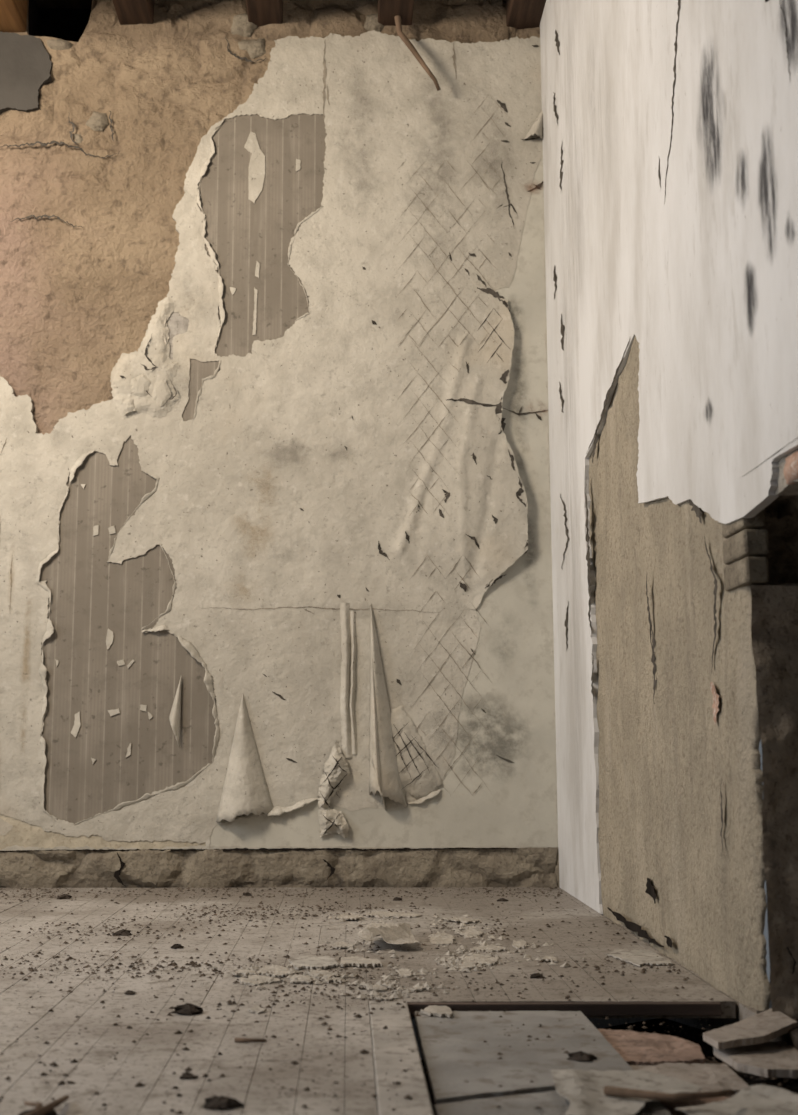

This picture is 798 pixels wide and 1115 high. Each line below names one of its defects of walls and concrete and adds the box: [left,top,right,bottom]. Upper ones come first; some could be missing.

spalling [0,0,543,435]
peeling [0,157,559,888]
spalling [589,336,771,1011]
spalling [775,449,798,495]